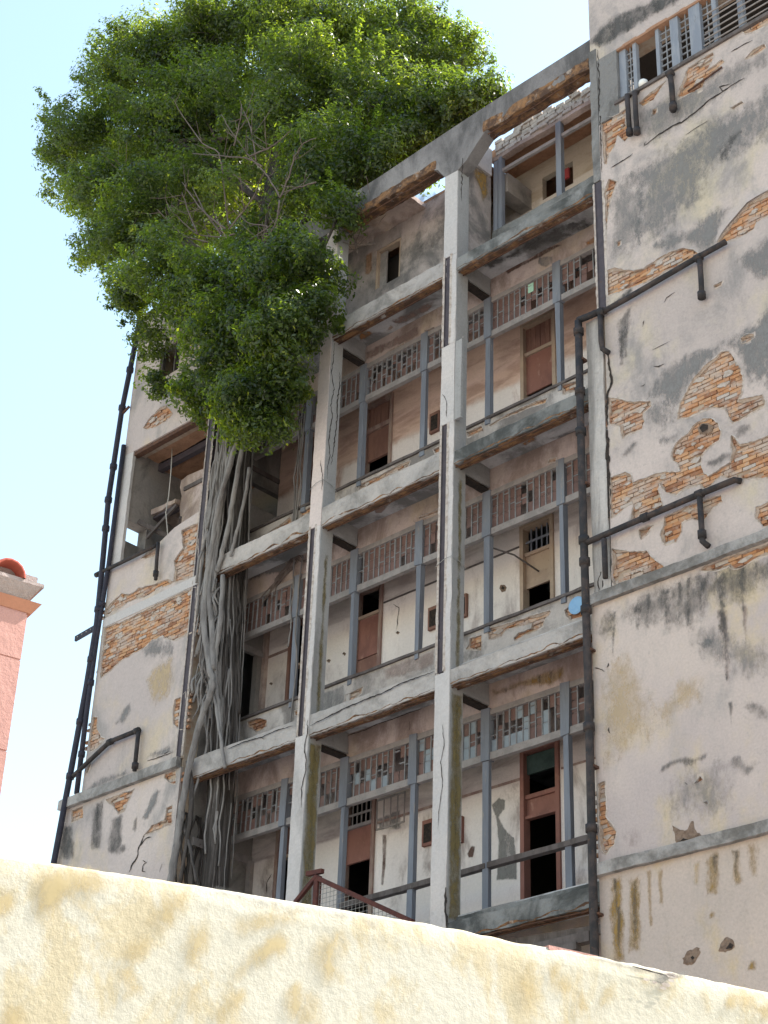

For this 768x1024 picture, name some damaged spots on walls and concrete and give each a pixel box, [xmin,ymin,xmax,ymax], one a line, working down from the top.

flaking render [717,191,768,243]
flaking render [332,179,699,358]
crack [320,343,341,490]
flaking render [606,350,768,585]
flaking render [96,398,592,785]
leakage [636,563,768,622]
leakage [61,827,73,856]
leakage [92,806,123,852]
crack [129,836,162,872]
flaking render [595,781,617,858]
spalling [672,821,701,843]
spalling [718,937,735,952]